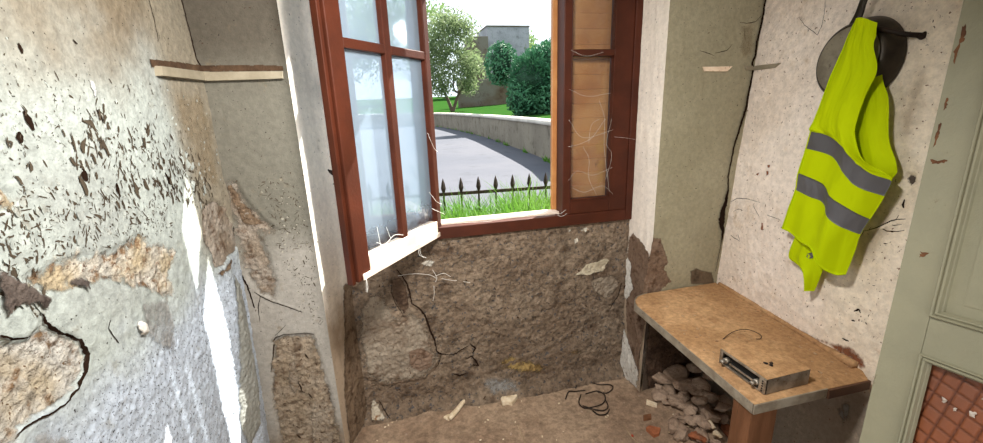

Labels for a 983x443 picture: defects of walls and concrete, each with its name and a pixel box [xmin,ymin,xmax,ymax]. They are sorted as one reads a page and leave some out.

crack [702,0,777,271]
flaking render [0,53,341,443]
peeling [371,400,410,421]
flaking render [360,278,443,390]
crack [391,270,468,369]
peeling [569,233,671,388]